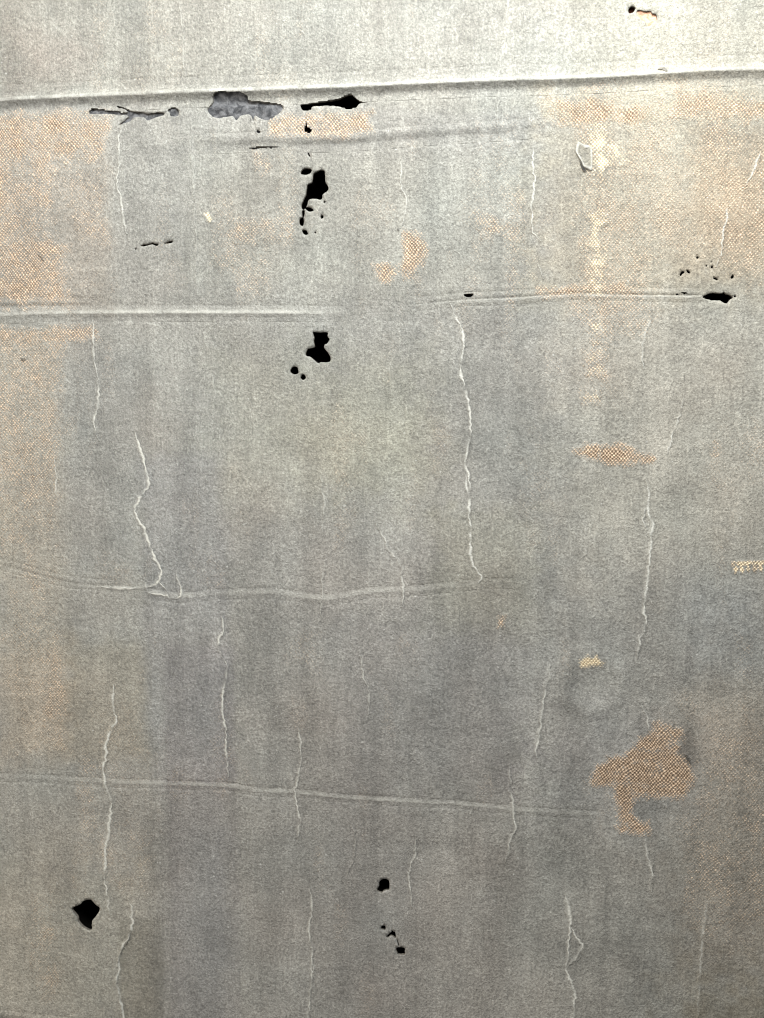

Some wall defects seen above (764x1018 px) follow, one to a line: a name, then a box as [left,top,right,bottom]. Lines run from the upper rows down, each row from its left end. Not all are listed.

peeling [208,92,283,120]
crack [101,431,184,600]
crack [100,684,137,1018]
crack [563,894,586,1018]